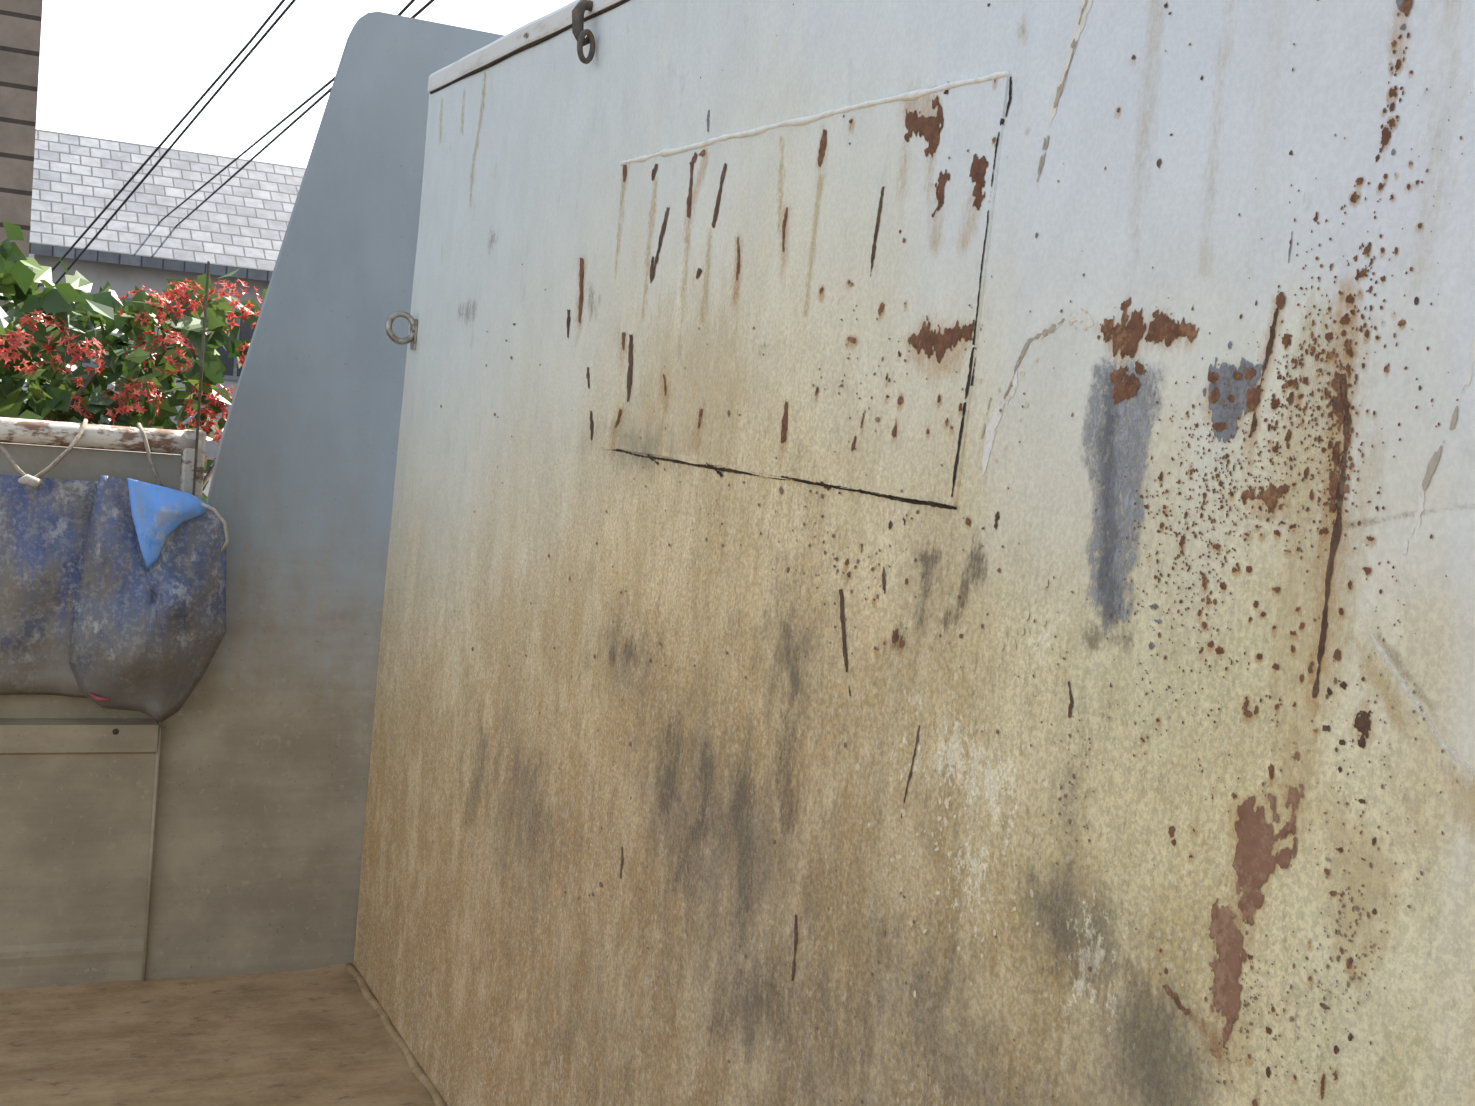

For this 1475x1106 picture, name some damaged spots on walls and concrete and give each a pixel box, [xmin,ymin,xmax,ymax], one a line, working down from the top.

corrosion [904,81,950,217]
corrosion [967,137,996,210]
corrosion [812,304,985,452]
water stain [1099,411,1117,623]
corrosion [1097,0,1450,1106]
peeling [1401,336,1475,555]
corrosion [1041,687,1103,842]